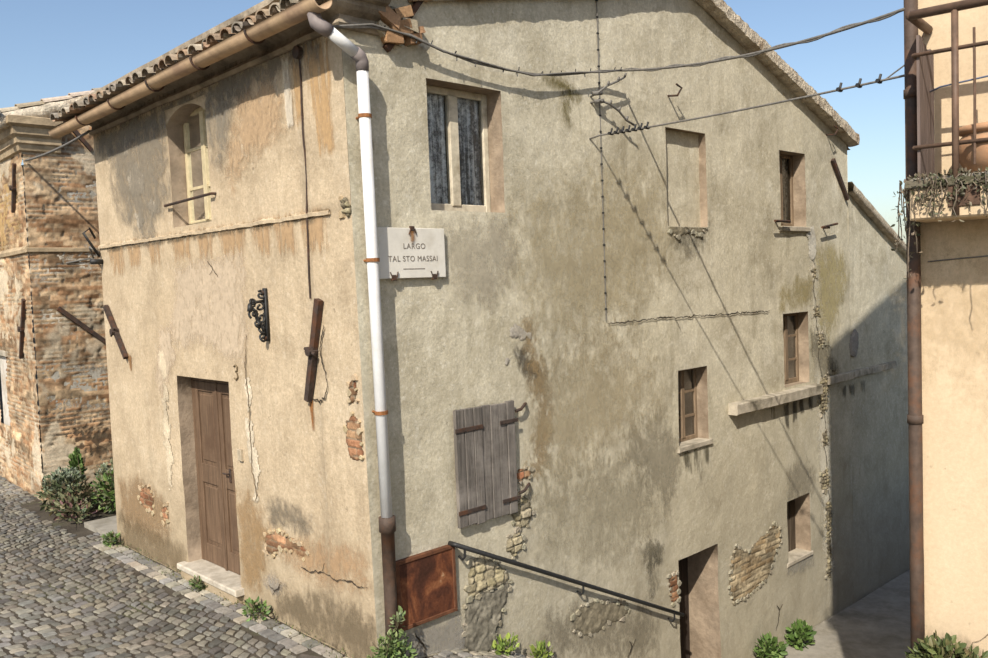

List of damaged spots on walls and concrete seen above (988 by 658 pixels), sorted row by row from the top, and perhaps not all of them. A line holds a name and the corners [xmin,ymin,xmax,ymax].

crack [608,310,770,328]
flaking render [343,374,365,461]
water stain [784,397,812,426]
peeling [120,478,170,539]
flaking render [262,528,311,561]
crack [301,563,367,588]
flaking render [461,466,536,652]
flaking render [666,570,682,607]
flaking render [728,521,783,605]